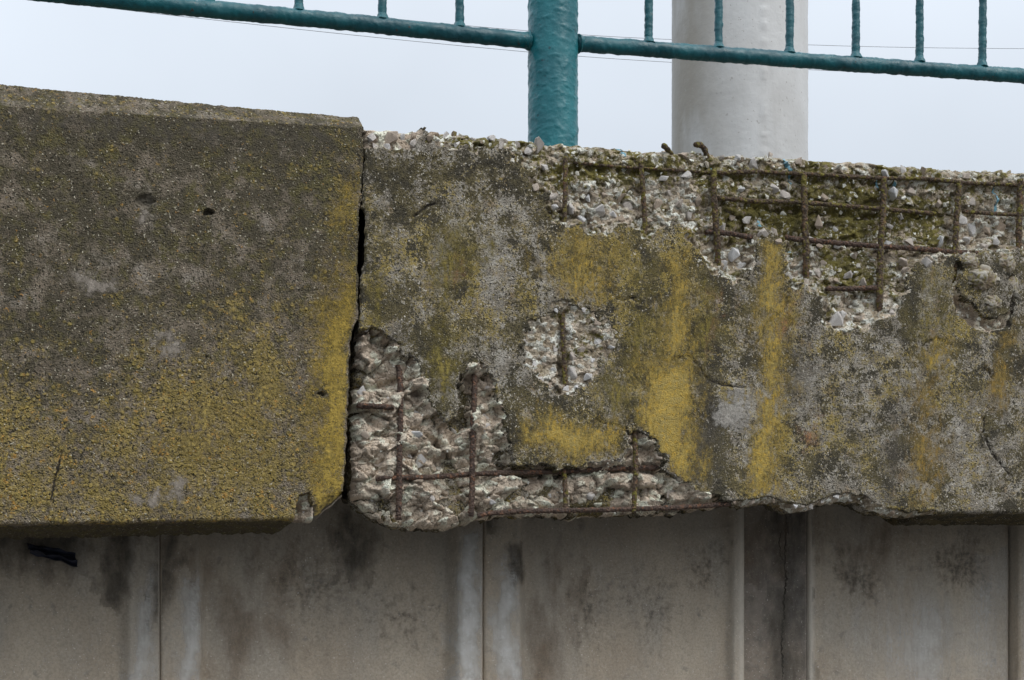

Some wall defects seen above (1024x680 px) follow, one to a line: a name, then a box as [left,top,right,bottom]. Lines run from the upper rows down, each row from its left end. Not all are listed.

spalling [362,130,1024,338]
spalling [520,300,618,396]
spalling [292,329,935,532]
water stain [182,586,199,680]